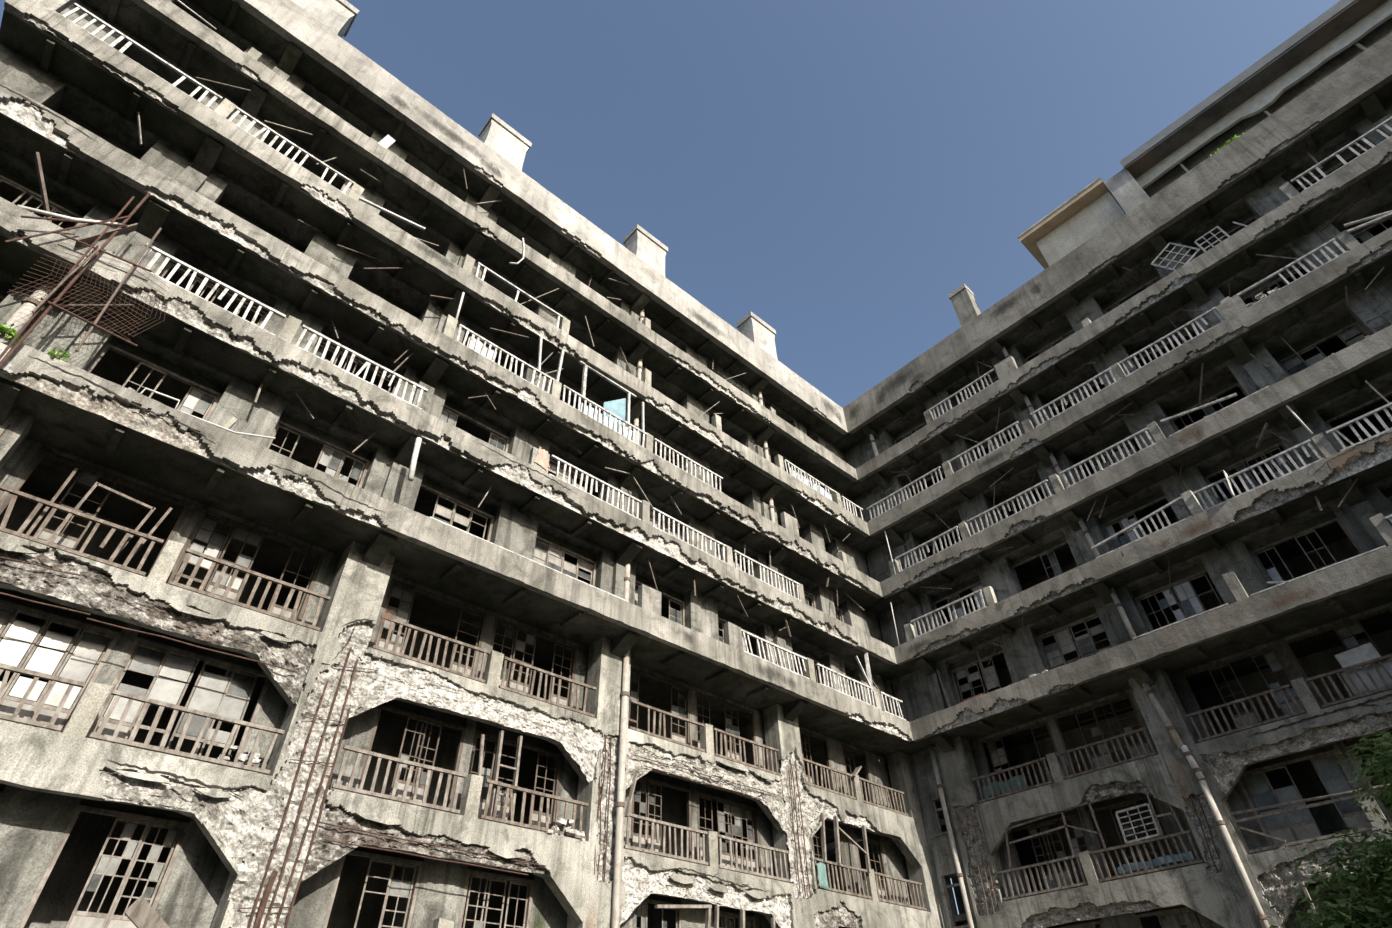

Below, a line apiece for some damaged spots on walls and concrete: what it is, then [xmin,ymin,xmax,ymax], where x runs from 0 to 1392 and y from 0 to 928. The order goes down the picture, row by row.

crack [1312,432,1392,476]
spalling [0,540,875,928]
spalling [1185,703,1392,873]
spalling [953,804,1000,917]
spalling [1022,901,1161,928]
spalling [1257,841,1392,921]